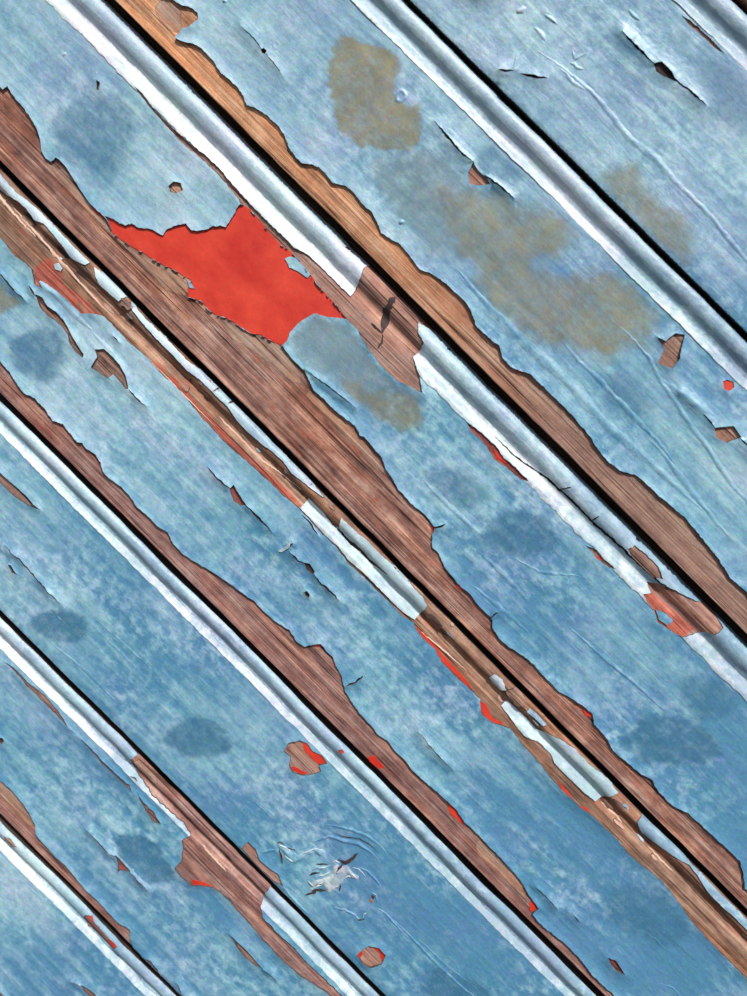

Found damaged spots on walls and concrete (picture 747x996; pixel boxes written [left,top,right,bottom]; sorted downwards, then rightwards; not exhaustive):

peeling [0,165,396,569]
damp [330,38,419,149]
peeling [115,0,747,636]
peeling [0,362,614,996]
peeling [300,498,747,978]